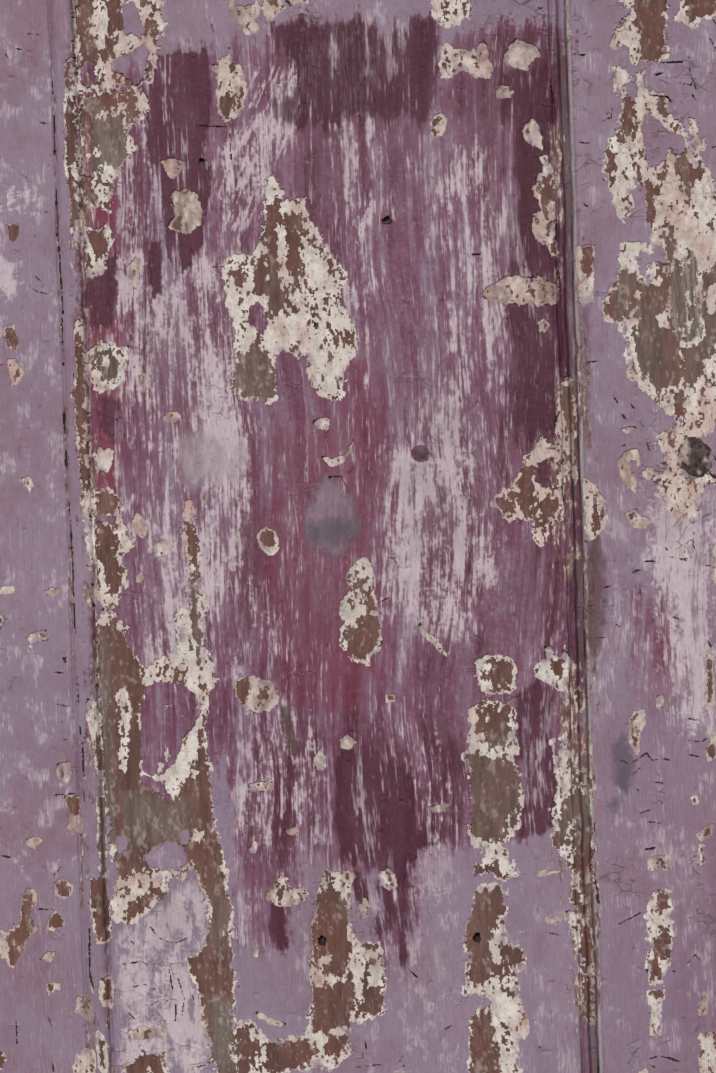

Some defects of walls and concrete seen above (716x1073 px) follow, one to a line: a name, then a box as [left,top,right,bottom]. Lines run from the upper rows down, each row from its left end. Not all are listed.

peeling [62,0,168,280]
peeling [160,157,203,234]
peeling [221,175,359,405]
peeling [438,38,541,99]
peeling [482,274,559,333]
peeling [522,118,560,258]
peeling [575,0,716,522]
crack [648,57,697,102]
peeling [489,376,608,547]
peeling [55,316,387,1073]
peeling [460,654,530,1073]
peeling [537,733,599,1029]